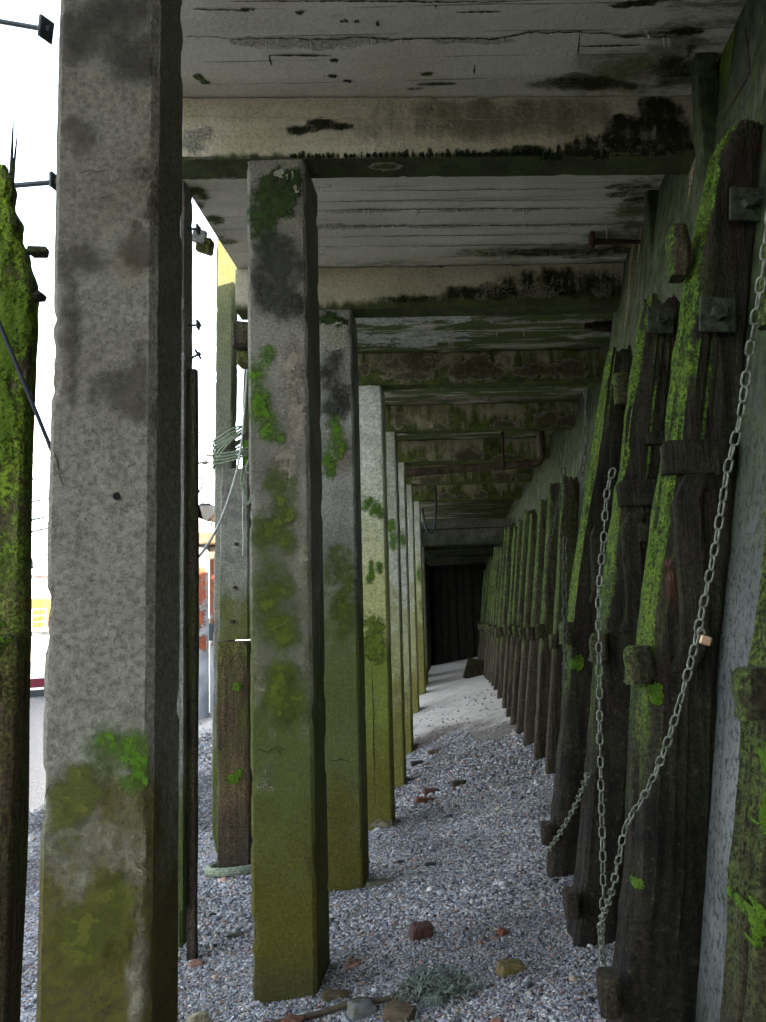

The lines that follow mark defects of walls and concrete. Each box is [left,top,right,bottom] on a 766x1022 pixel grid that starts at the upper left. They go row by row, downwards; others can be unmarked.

crack [196,0,535,13]
damp [231,36,392,51]
crack [188,31,698,65]
damp [617,27,705,85]
damp [286,72,696,198]
damp [605,184,651,202]
damp [251,232,306,321]
damp [383,222,644,329]
damp [355,316,603,383]
damp [320,350,352,420]